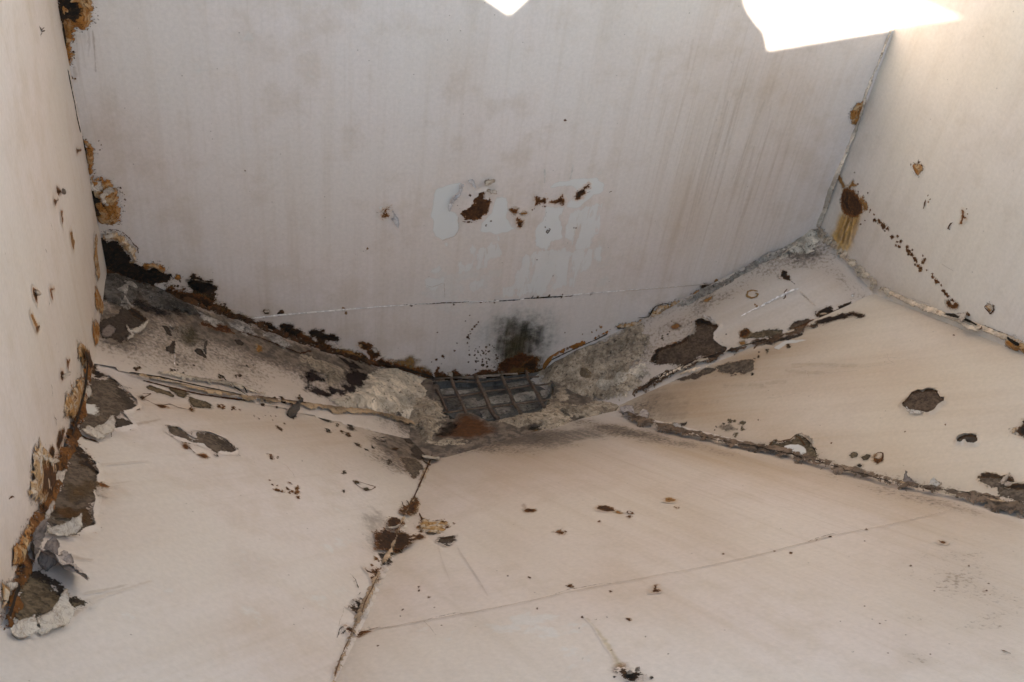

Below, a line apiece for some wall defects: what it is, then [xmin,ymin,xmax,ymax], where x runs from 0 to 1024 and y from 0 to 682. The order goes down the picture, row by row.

rust [848,101,863,126]
leakage [779,226,891,298]
rust [827,172,970,316]
crack [500,294,571,302]
leakage [298,294,859,452]
peeling [648,314,811,381]
peeling [896,386,950,417]
peeling [159,424,242,458]
peeling [5,364,212,639]
crack [412,454,432,500]
peeling [975,471,1024,502]
crack [334,576,378,676]